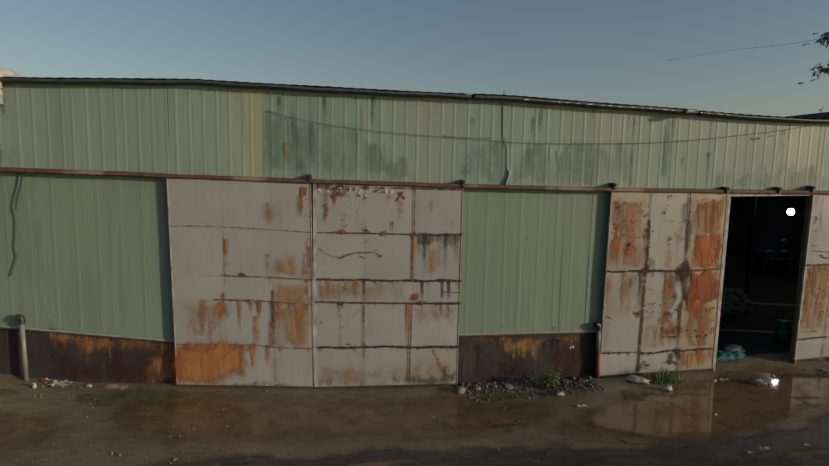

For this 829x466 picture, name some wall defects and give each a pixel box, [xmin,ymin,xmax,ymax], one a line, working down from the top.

rust [48,328,150,353]
rust [146,187,463,385]
rust [500,336,575,358]
rust [602,192,726,374]
rust [798,264,829,355]